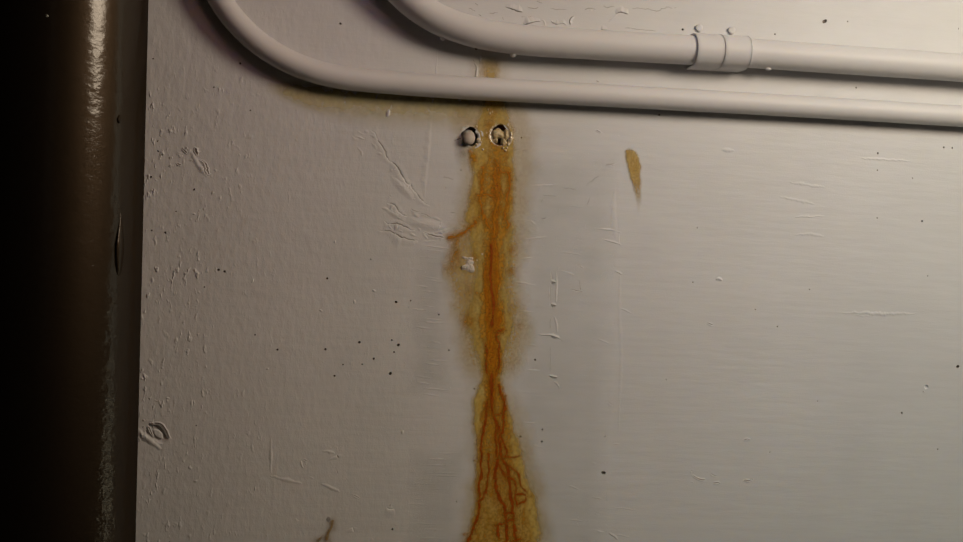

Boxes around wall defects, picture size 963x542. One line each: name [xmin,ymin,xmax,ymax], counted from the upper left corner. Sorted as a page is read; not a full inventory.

rust [447,101,541,542]
rust [626,150,641,194]